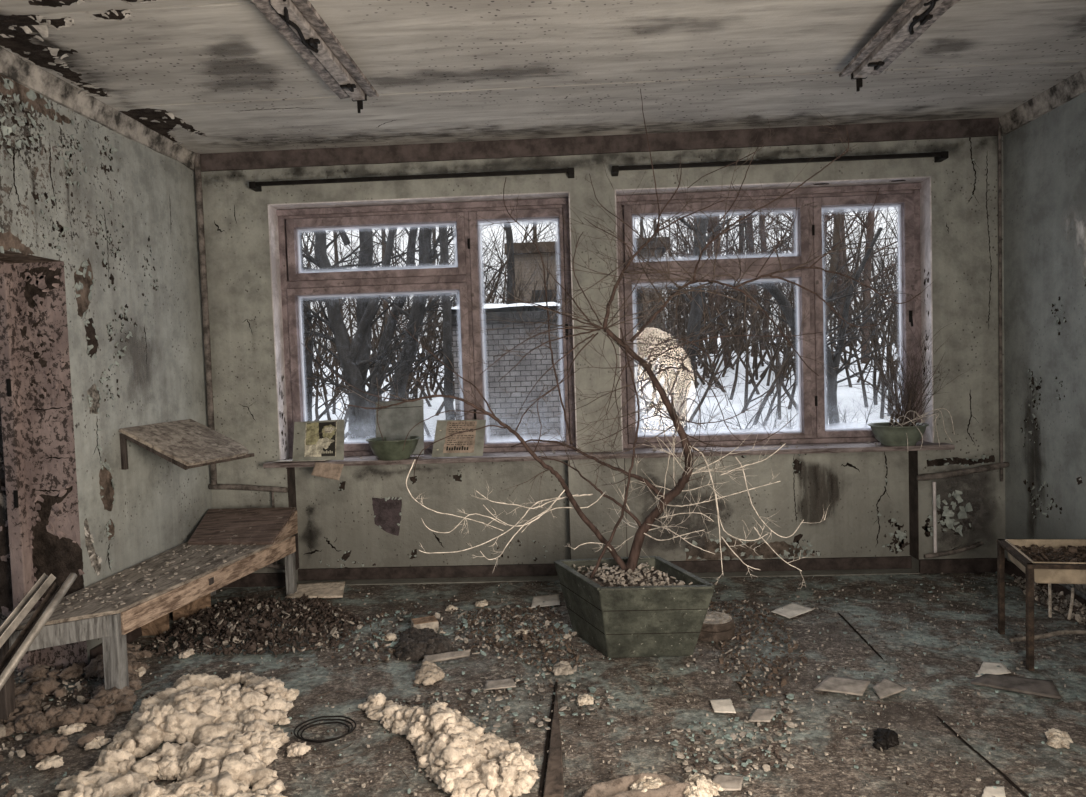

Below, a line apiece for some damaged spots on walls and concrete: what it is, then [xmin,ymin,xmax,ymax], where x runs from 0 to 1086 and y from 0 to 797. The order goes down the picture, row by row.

peeling [0,0,110,97]
peeling [0,74,87,251]
peeling [120,108,206,145]
peeling [0,201,138,417]
peeling [0,520,13,616]
peeling [29,482,102,601]
spalling [99,459,116,540]
peeling [372,497,402,536]
damp [798,462,839,524]
peeling [922,490,973,537]
crack [838,613,883,659]
crack [936,715,1029,797]